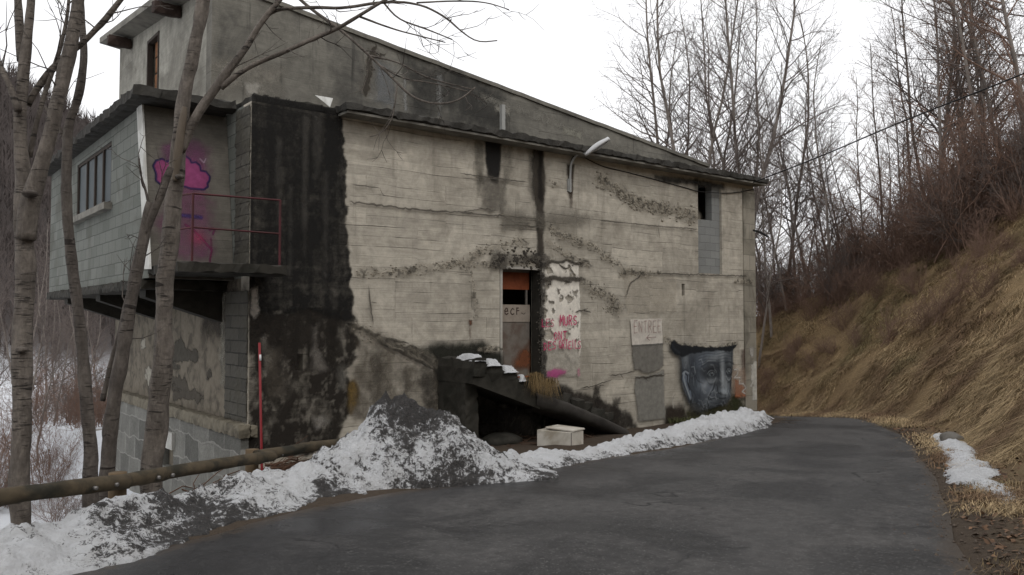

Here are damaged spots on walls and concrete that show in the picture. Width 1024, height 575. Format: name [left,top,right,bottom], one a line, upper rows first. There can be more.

crack [351,173,545,229]
damp [477,141,589,266]
damp [202,94,439,456]
peeling [356,224,651,380]
flaking render [171,337,204,404]